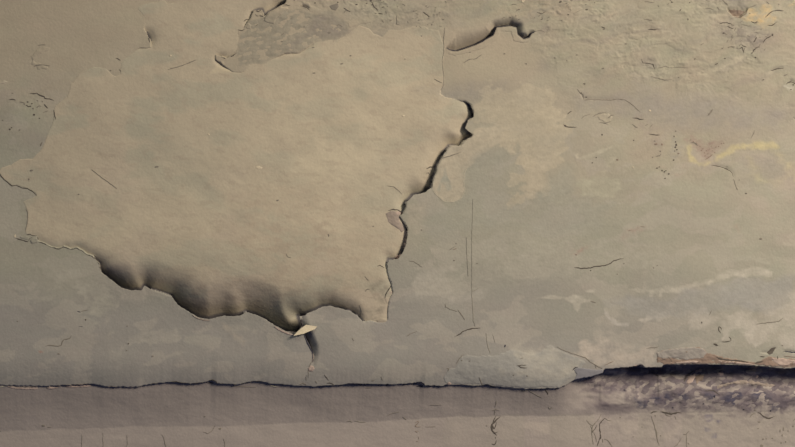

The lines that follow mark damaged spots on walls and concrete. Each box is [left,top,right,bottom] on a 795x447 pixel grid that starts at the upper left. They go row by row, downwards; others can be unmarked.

peeling [0,0,474,336]
crack [0,333,449,390]